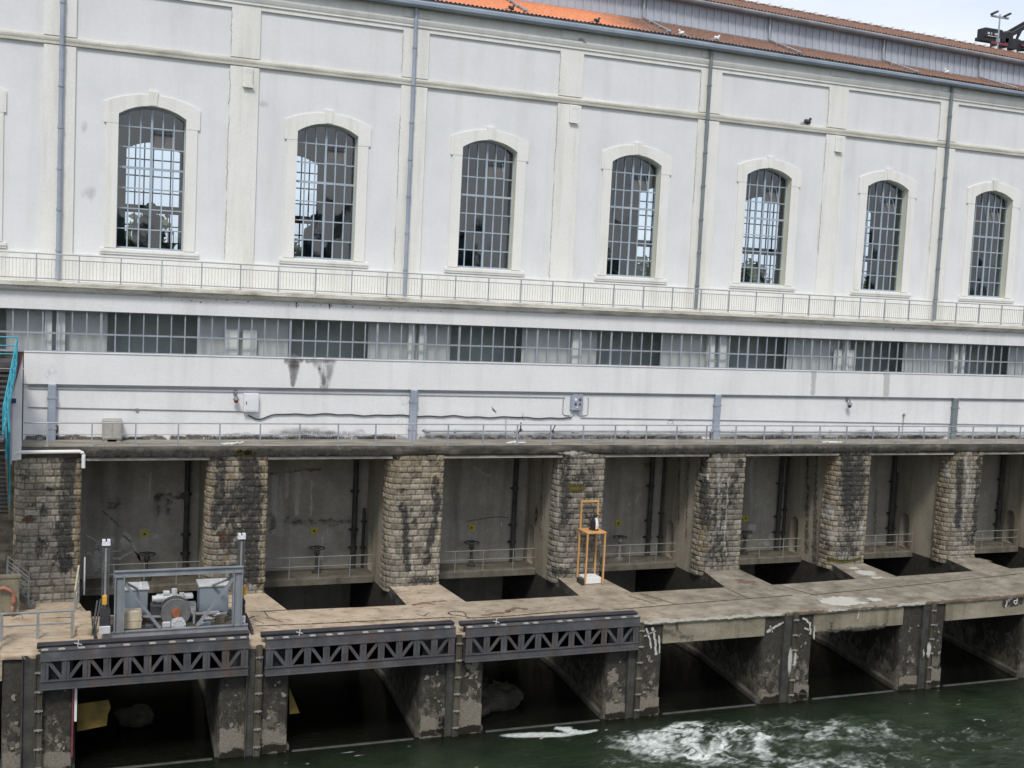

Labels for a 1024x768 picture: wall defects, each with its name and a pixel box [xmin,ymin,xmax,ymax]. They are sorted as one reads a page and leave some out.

leakage [285,355,331,388]
leakage [25,430,406,561]
leakage [419,433,943,565]
leakage [962,456,973,538]